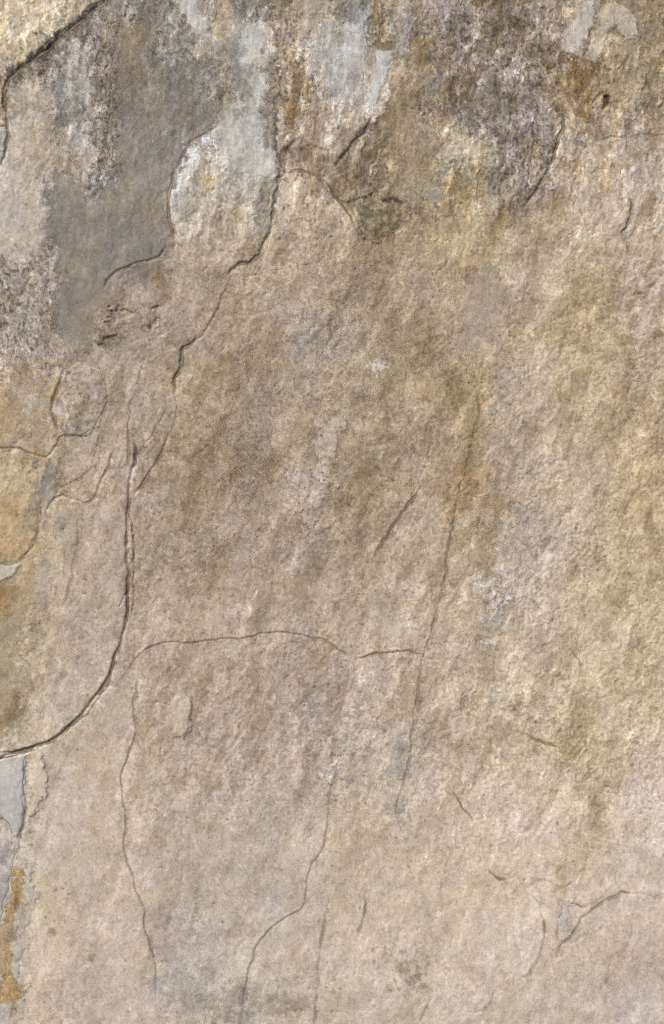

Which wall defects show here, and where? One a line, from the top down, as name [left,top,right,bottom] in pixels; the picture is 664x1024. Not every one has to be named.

crack [167,132,208,230]
crack [106,257,159,281]
crack [172,343,193,388]
crack [0,426,163,794]
crack [427,490,460,642]
crack [403,675,420,785]
crack [313,918,325,1020]